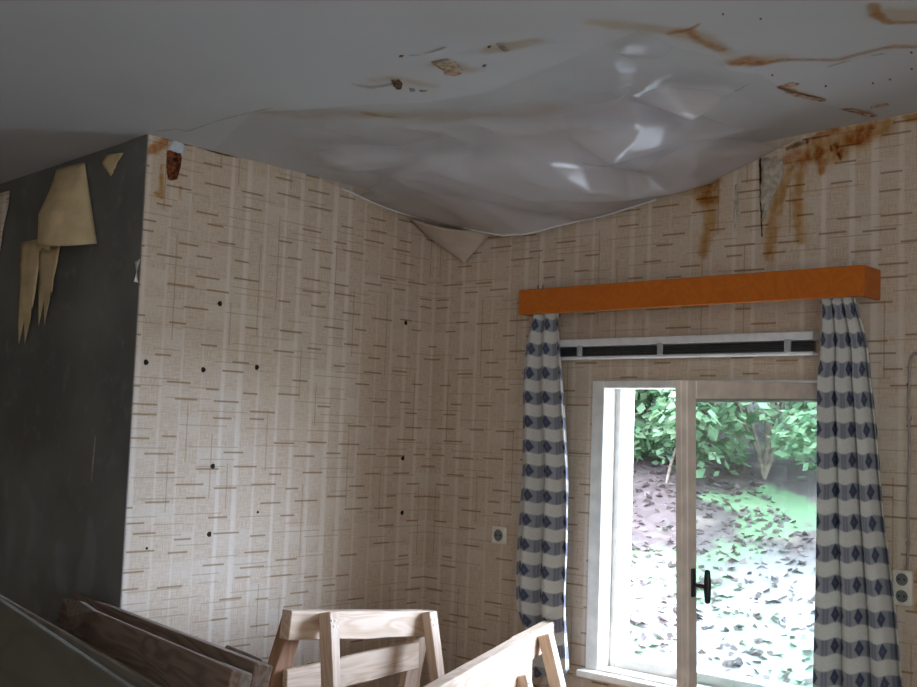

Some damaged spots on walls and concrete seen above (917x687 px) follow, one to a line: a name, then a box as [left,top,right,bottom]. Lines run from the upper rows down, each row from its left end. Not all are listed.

peeling [431,59,464,76]
spalling [391,80,428,92]
peeling [777,82,825,102]